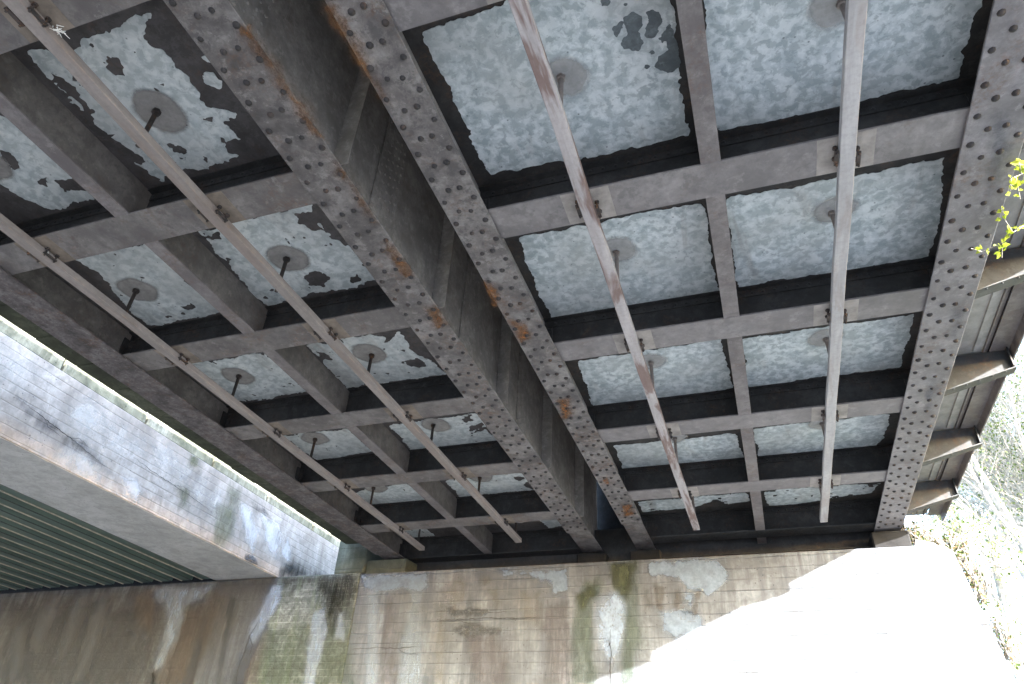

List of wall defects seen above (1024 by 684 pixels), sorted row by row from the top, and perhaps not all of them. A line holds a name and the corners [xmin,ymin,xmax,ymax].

peeling [0,115,94,210]
peeling [27,49,166,182]
peeling [74,13,240,171]
peeling [422,0,564,175]
peeling [529,0,690,159]
peeling [198,205,375,306]
peeling [307,331,446,388]
leakage [256,589,343,684]
leakage [577,587,594,608]
efflorescence [599,594,623,657]
peeling [648,559,728,638]